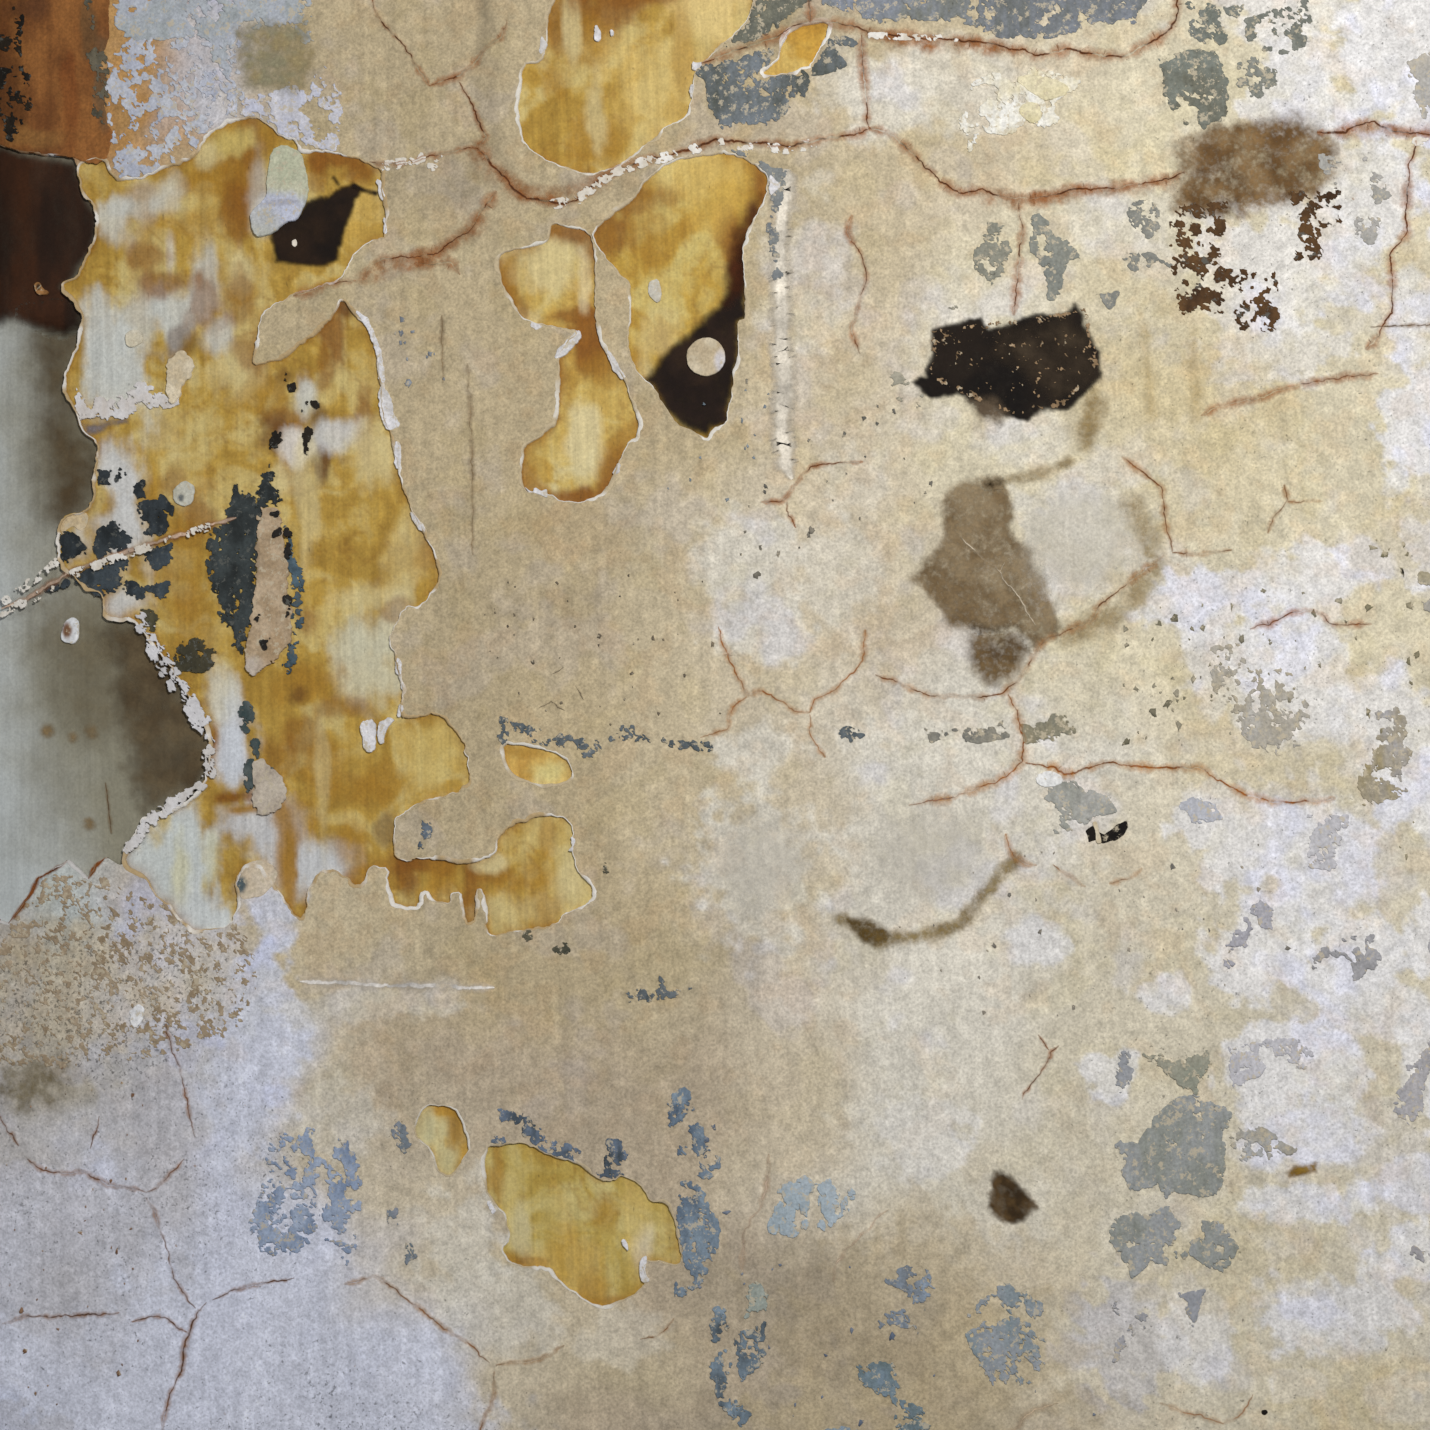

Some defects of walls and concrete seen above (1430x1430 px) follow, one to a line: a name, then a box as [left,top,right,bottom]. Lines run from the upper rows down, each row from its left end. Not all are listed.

peeling [494,149,787,503]
crack [374,0,1184,306]
peeling [514,0,1147,176]
peeling [1029,213,1080,301]
crack [1209,120,1430,413]
peeling [0,0,609,942]
crack [705,626,930,757]
damp [913,472,1120,683]
crack [911,576,1307,805]
damp [837,856,1018,947]
crack [21,1029,292,1411]
peeling [391,1087,721,1309]